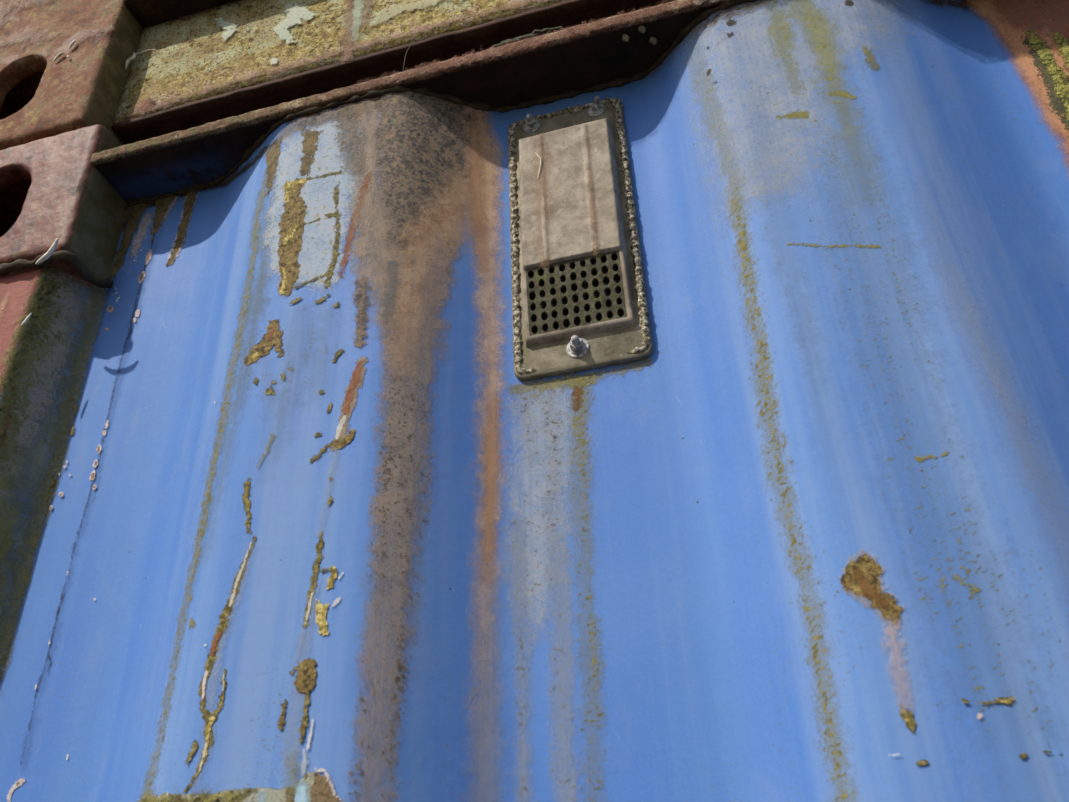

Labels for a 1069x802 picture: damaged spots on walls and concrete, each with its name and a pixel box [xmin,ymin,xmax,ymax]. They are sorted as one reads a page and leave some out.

peeling [215,17,237,41]
peeling [273,3,316,43]
peeling [369,0,441,27]
corrosion [967,0,1069,161]
peeling [263,120,363,307]
corrosion [110,91,503,802]
peeling [310,429,356,463]
corrosion [840,554,902,663]
peeling [155,767,343,802]